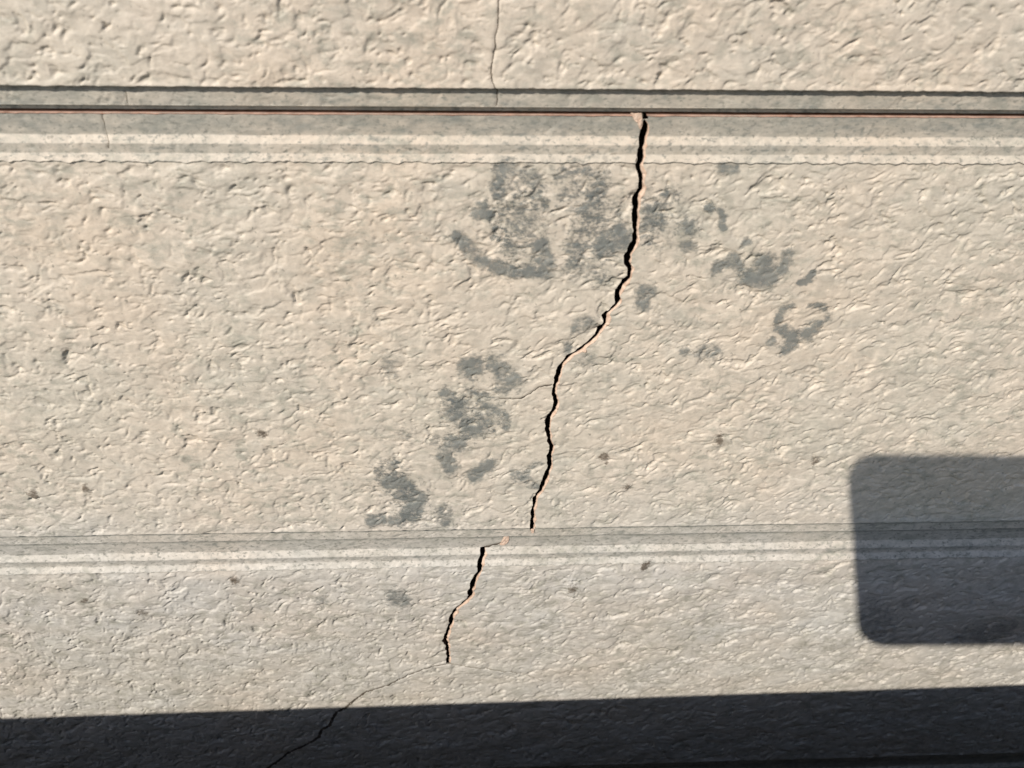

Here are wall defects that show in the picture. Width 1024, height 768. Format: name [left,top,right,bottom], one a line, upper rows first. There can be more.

crack [499,112,649,528]
crack [267,542,545,768]